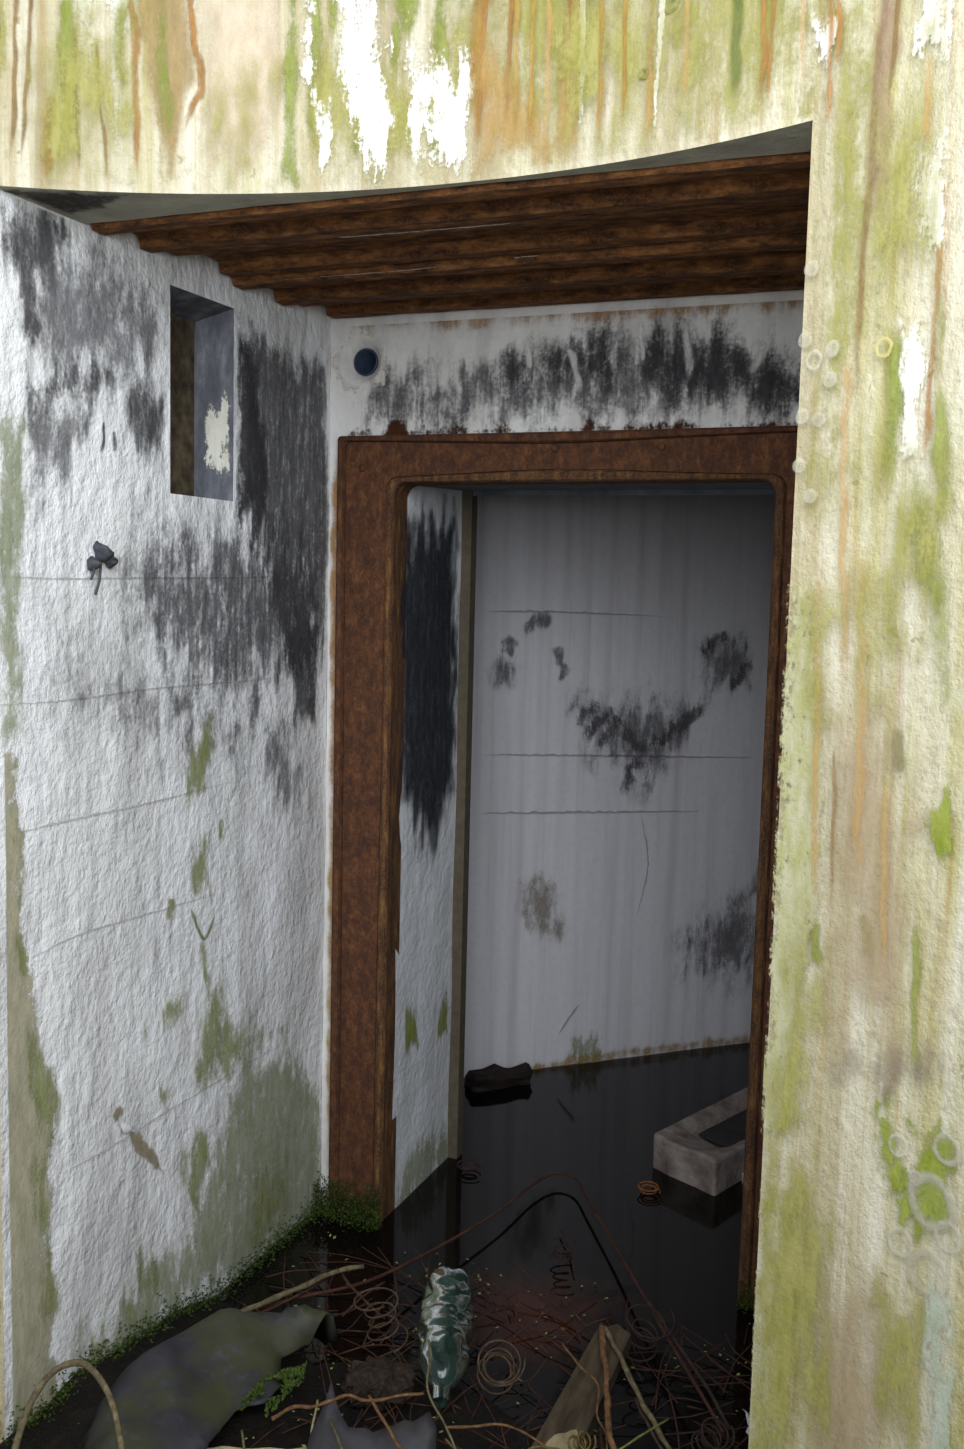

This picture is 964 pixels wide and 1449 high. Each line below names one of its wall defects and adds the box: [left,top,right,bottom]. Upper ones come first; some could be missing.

rust [128,0,140,161]
peeling [299,0,474,186]
rust [471,0,580,153]
peeling [812,16,838,68]
rust [827,0,843,118]
peeling [912,0,954,60]
rust [348,420,467,436]
water stain [567,349,581,388]
water stain [681,320,693,372]
water stain [884,337,903,472]
peeling [898,318,930,460]
water stain [192,911,213,980]